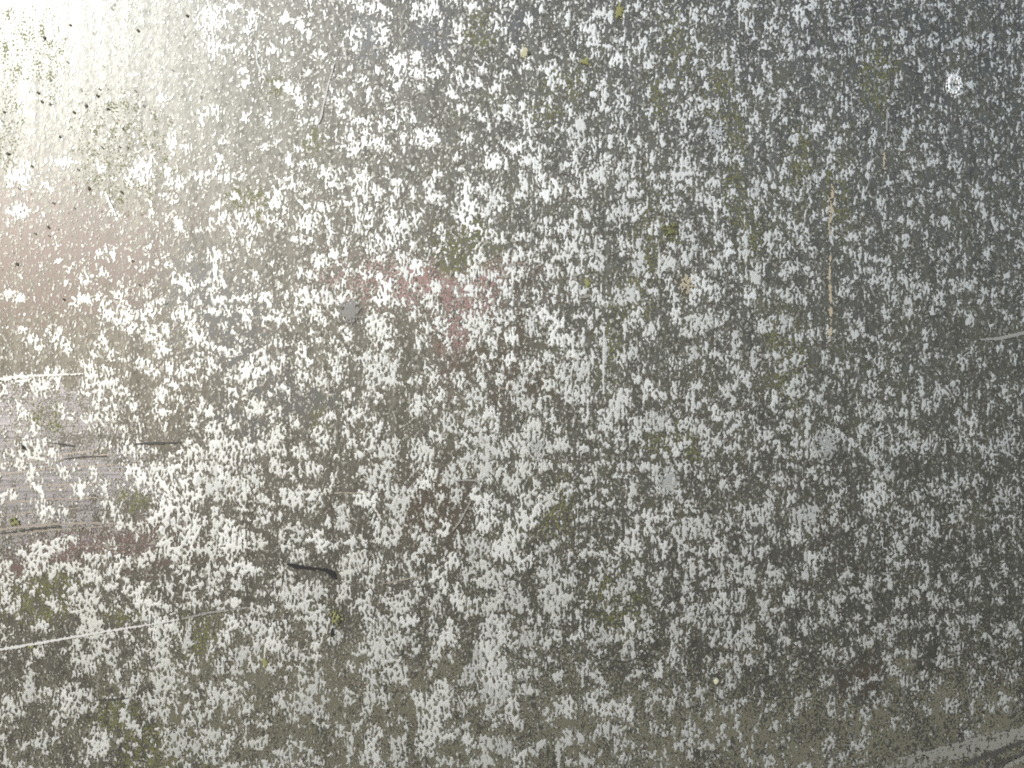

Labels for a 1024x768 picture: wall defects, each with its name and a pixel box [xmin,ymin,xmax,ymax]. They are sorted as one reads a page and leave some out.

spalling [287,563,336,580]